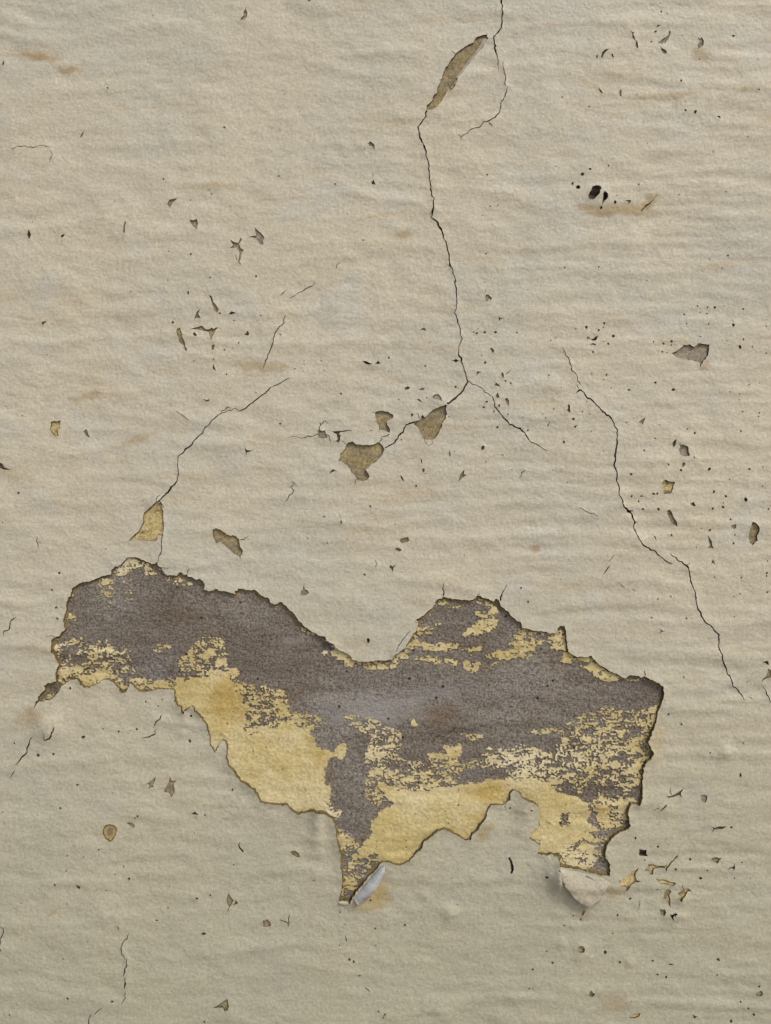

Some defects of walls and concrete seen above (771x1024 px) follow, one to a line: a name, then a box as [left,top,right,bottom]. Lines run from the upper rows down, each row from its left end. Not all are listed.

peeling [427,34,488,110]
crack [459,0,508,137]
crack [417,110,548,451]
peeling [672,343,710,366]
crack [152,282,315,508]
peeling [291,411,393,482]
crack [385,421,415,448]
peeling [405,386,447,446]
peeling [128,501,164,541]
peeling [213,528,248,559]
crack [563,348,771,703]
peeling [34,557,691,921]